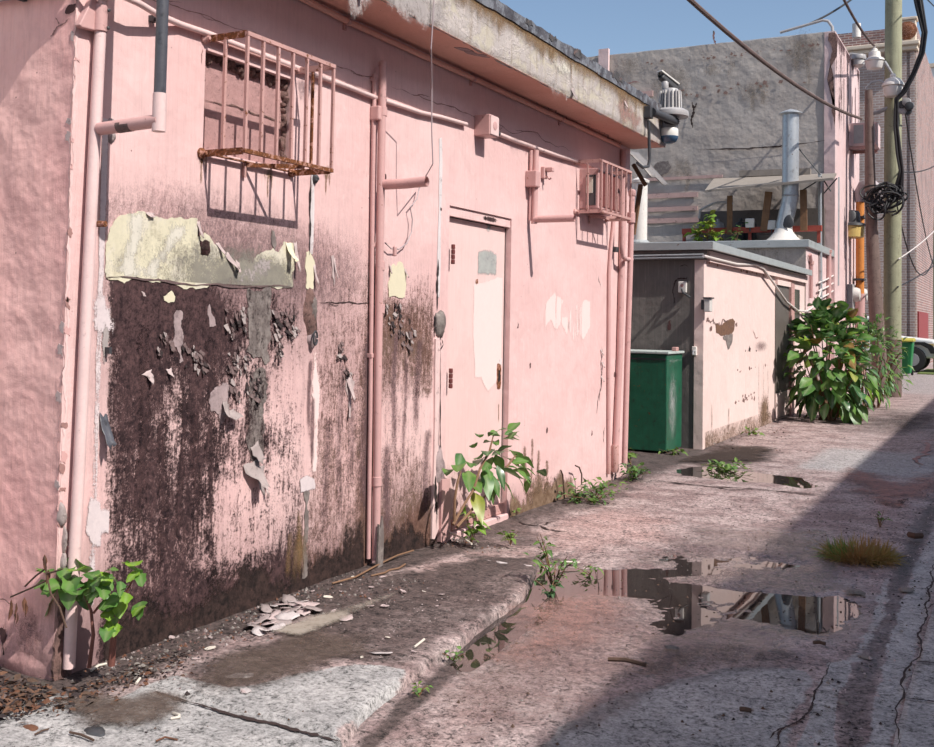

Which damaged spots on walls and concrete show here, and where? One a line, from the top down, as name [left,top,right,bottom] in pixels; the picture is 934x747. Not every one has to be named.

peeling [104,211,319,496]
peeling [386,261,417,352]
spalling [706,318,737,349]
damp [86,265,438,663]
crack [770,662,831,747]
crack [894,565,934,744]